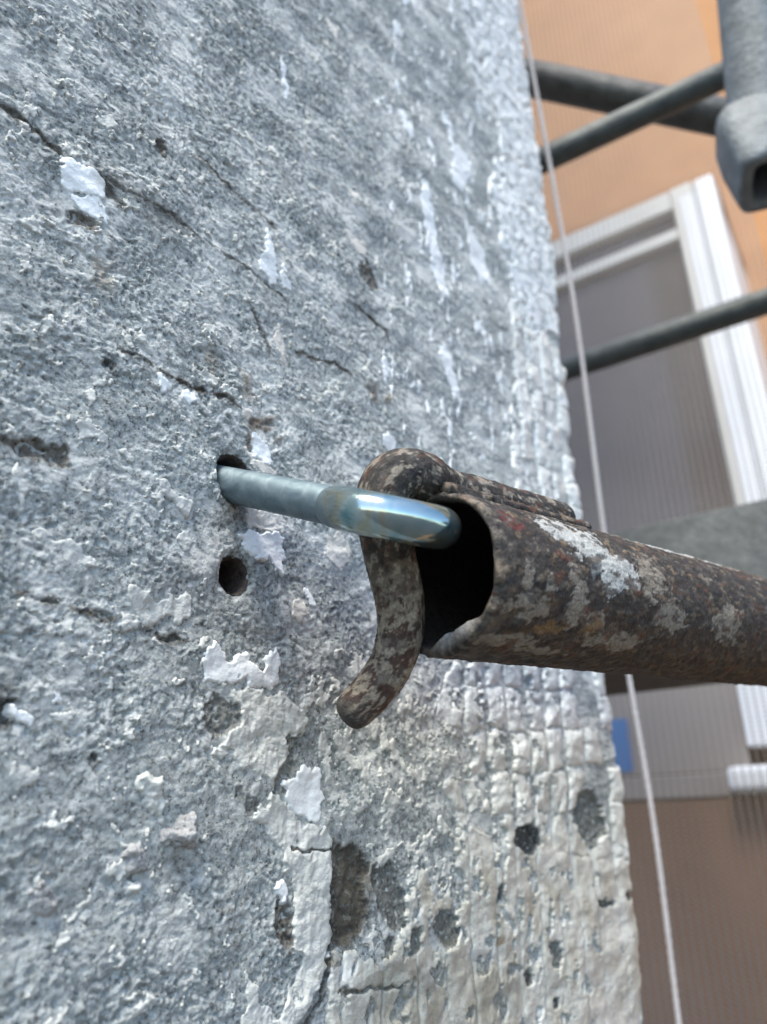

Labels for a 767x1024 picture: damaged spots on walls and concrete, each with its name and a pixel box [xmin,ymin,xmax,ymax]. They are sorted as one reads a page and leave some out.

crack [0,104,61,153]
peeling [6,141,119,286]
crack [102,177,125,206]
crack [197,154,276,229]
crack [251,305,271,354]
crack [358,306,390,342]
crack [296,351,353,376]
peeling [238,507,289,577]
peeling [177,636,486,1024]
spalling [514,824,539,856]
spalling [573,789,605,849]
peeling [52,858,126,953]